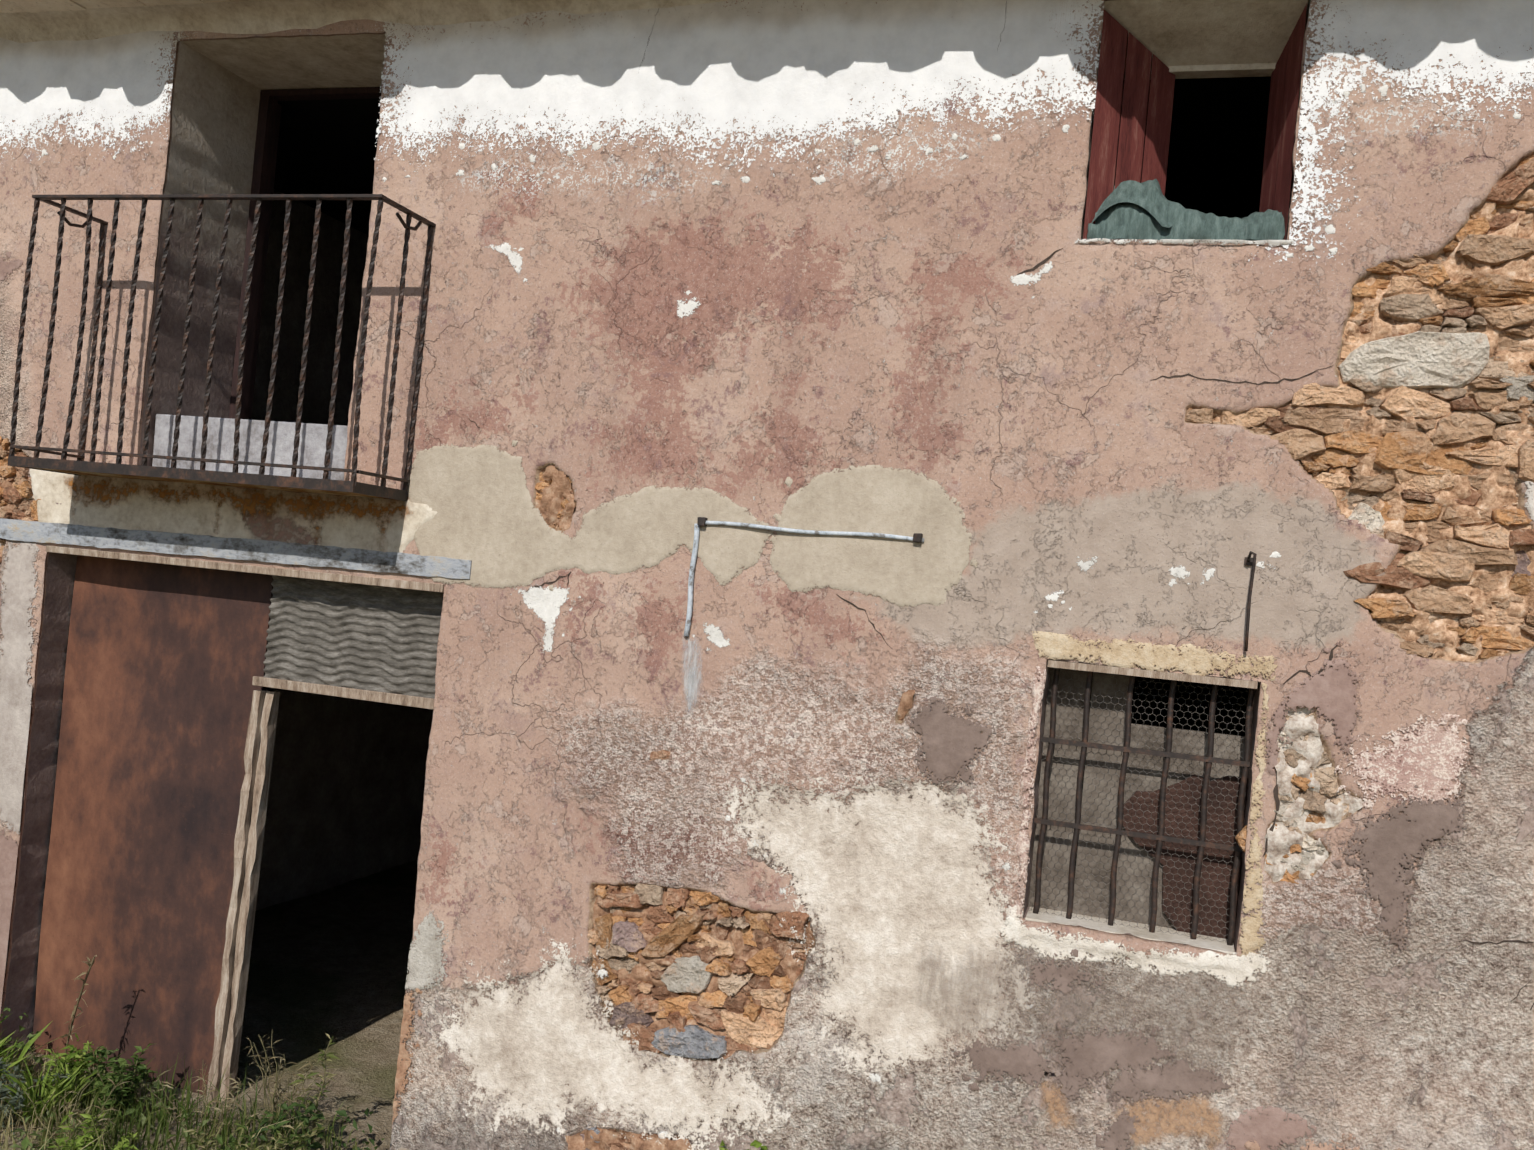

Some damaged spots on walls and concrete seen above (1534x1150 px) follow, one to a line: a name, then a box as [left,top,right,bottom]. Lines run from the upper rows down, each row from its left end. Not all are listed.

peeling [1248,0,1534,270]
crack [1153,365,1333,385]
flaking render [1185,154,1534,661]
flaking render [0,436,61,521]
corrosion [67,477,410,540]
spalling [535,465,576,533]
spalling [1169,565,1216,587]
peeling [0,538,39,1013]
flaking render [1235,638,1482,956]
flaking render [392,696,1231,1150]
flaking render [1224,1106,1317,1150]